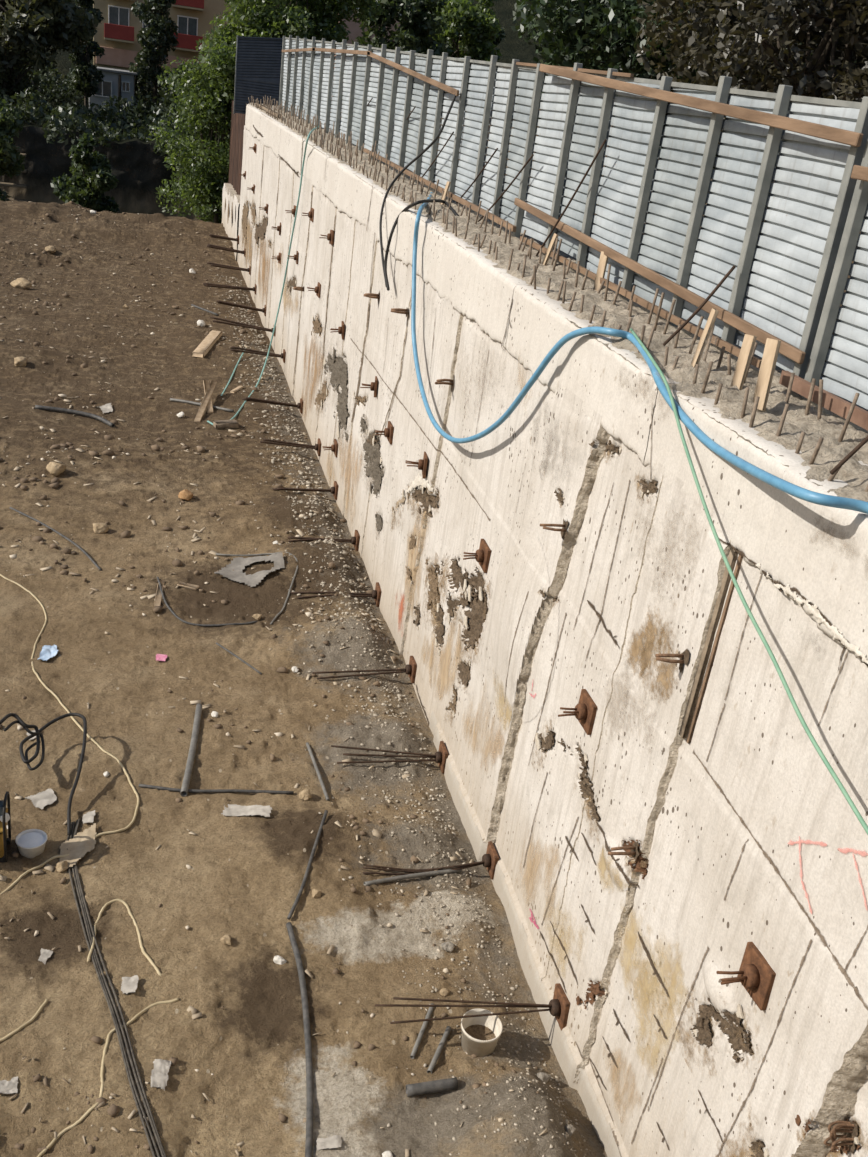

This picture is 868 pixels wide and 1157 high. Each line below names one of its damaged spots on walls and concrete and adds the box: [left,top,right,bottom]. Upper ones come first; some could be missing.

spalling [311,314,324,337]
spalling [314,347,335,410]
spalling [406,554,489,722]
crack [719,539,868,670]
spalling [535,727,600,832]
spalling [576,980,608,1010]